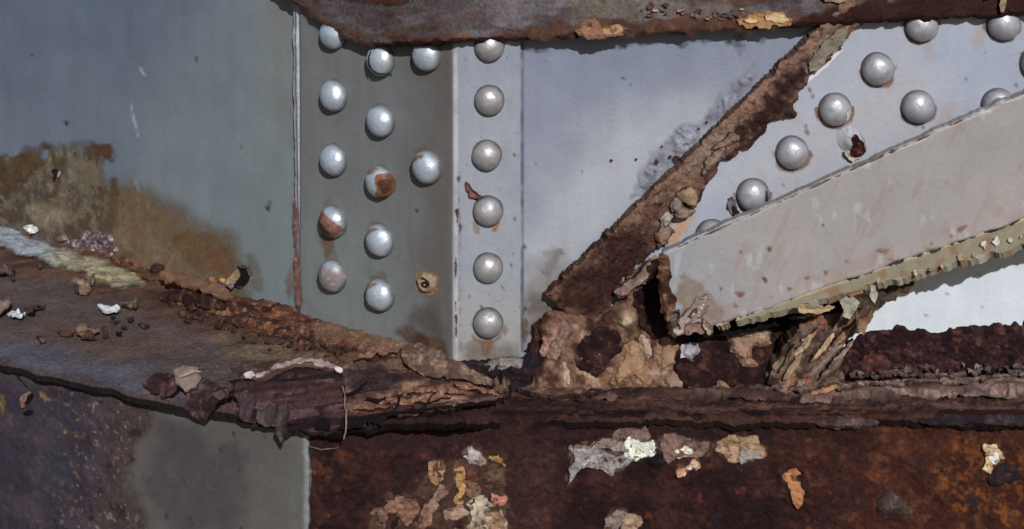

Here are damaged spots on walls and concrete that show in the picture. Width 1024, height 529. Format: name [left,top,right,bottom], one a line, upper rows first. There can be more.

peeling [574,15,628,40]
rust [596,0,770,37]
rust [815,107,854,129]
peeling [958,235,1023,262]
peeling [797,264,944,335]
rust [0,143,1024,529]
peeling [370,445,508,529]
peeling [566,426,768,487]